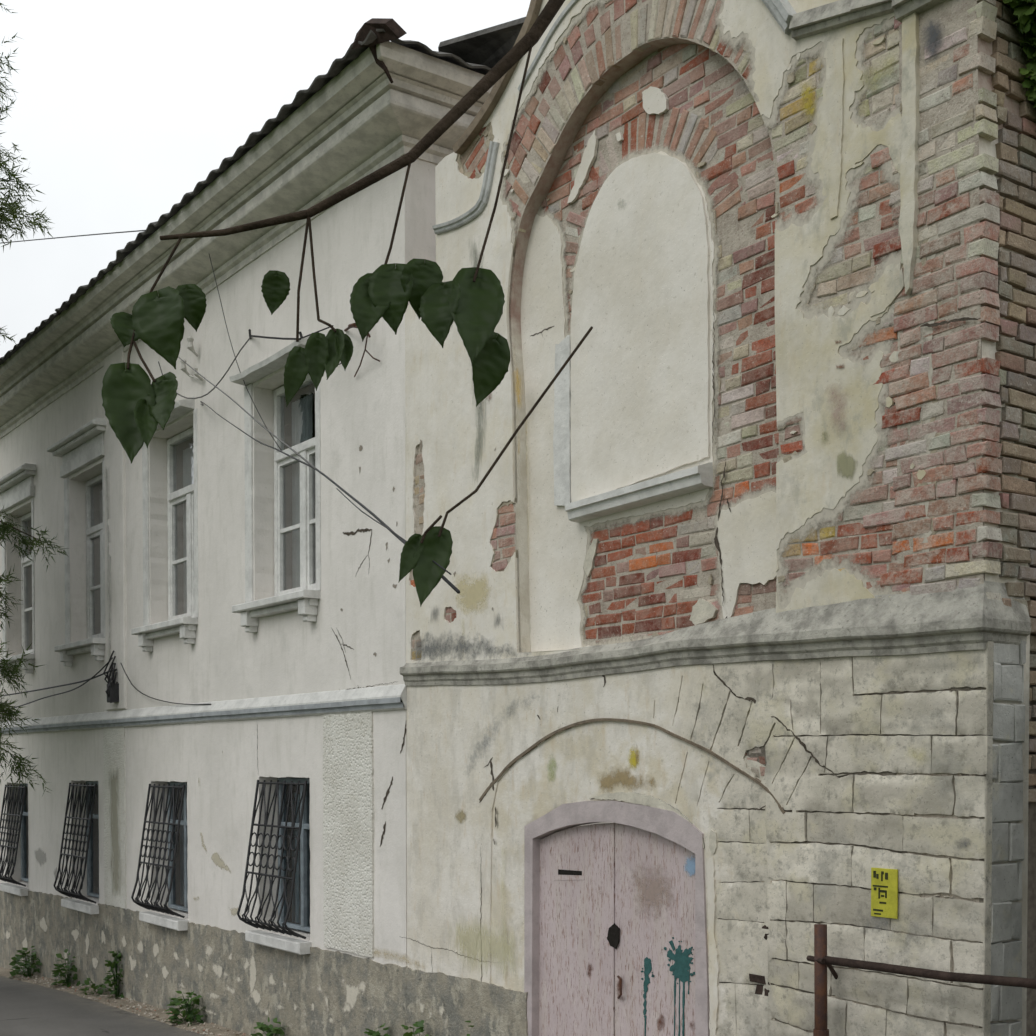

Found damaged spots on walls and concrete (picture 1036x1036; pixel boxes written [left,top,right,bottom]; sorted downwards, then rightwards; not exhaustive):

flaking render [459,127,490,179]
flaking render [500,0,939,647]
damp [475,403,483,461]
flaking render [414,440,425,525]
crack [343,528,372,574]
flaking render [490,504,516,571]
flaking render [445,607,456,623]
crack [332,629,394,690]
crack [713,665,823,767]
crack [380,777,393,846]
crack [479,757,497,856]
crack [399,887,494,982]